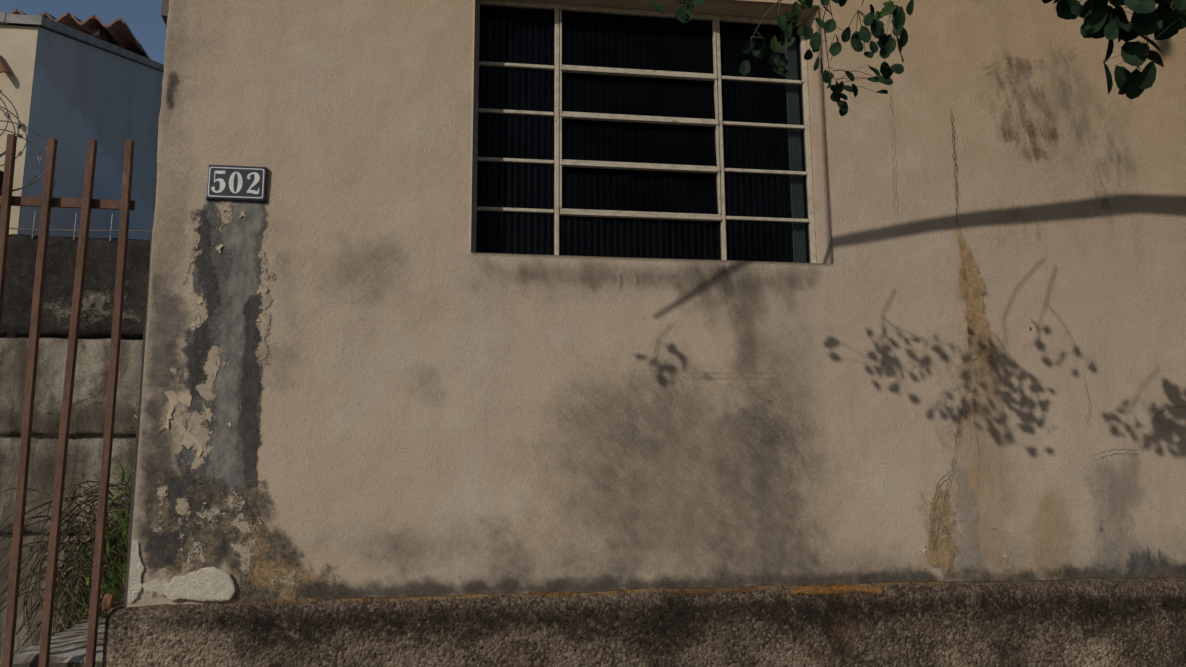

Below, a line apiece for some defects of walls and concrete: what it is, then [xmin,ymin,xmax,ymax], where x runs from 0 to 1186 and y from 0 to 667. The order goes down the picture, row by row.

peeling [128,200,343,602]
crack [920,103,1008,571]